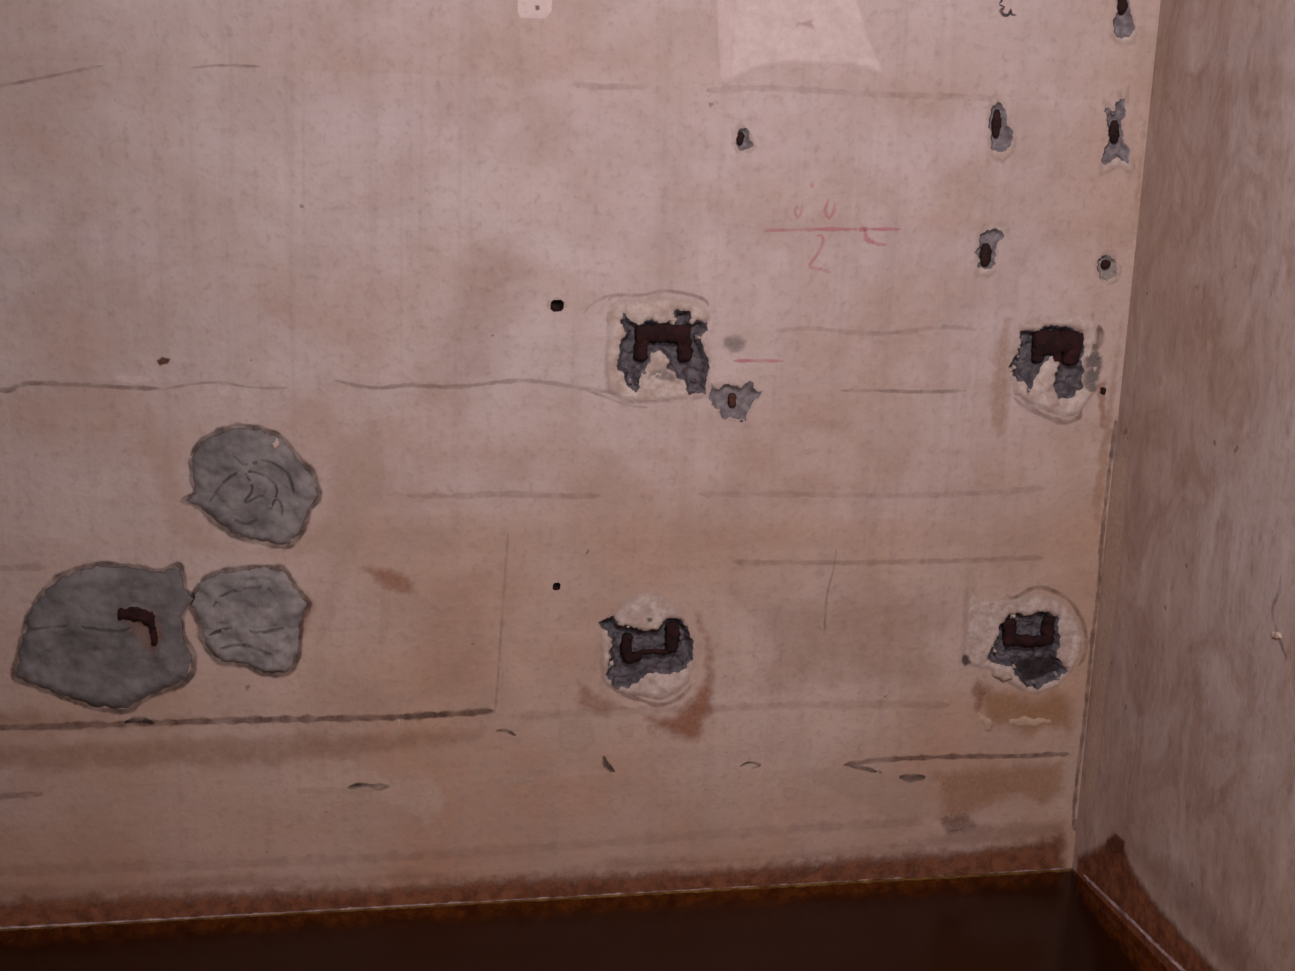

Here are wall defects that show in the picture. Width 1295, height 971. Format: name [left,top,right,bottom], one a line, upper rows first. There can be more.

spalling [1112,0,1136,43]
spalling [987,95,1015,161]
spalling [1100,89,1135,174]
spalling [974,224,1004,276]
spalling [606,297,763,422]
spalling [1008,313,1106,414]
spalling [599,593,694,698]
spalling [962,592,1081,693]
spalling [976,712,1052,732]